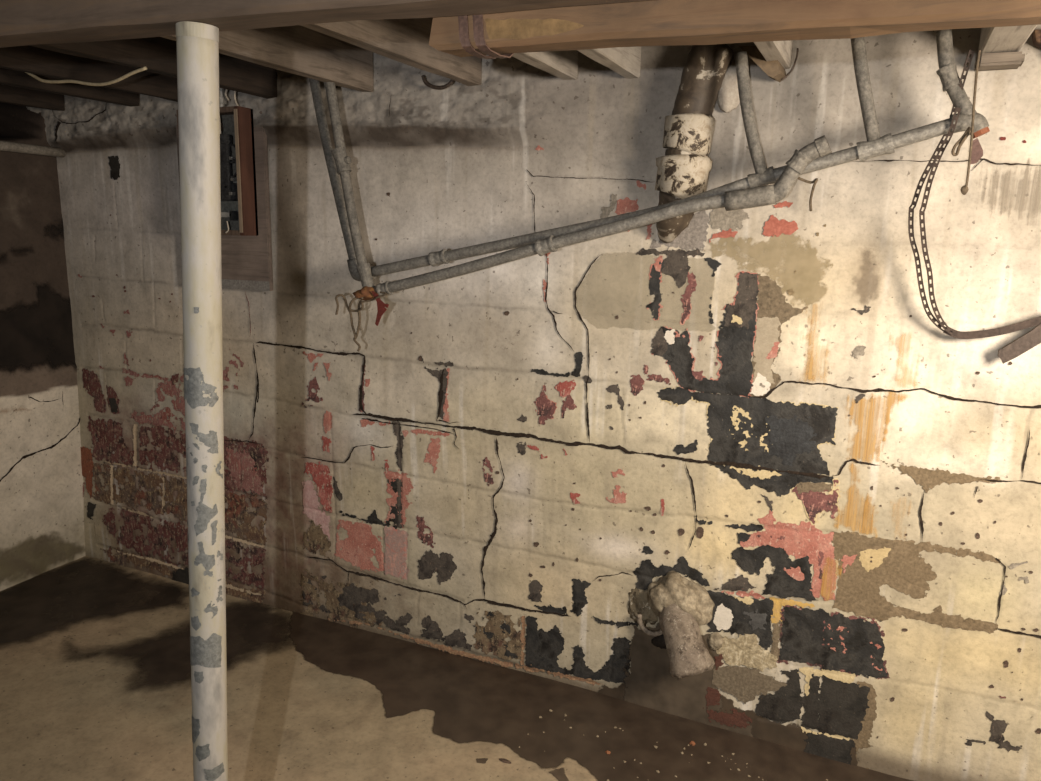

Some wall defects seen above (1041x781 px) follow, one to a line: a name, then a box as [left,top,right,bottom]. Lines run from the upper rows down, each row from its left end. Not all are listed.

water stain [0,284,77,372]
peeling [80,347,269,684]
peeling [299,351,638,686]
crack [225,254,875,616]
peeling [606,207,1033,765]
rust [835,487,877,537]
rust [848,336,915,473]
crack [755,381,1041,498]
water stain [0,535,189,646]
water stain [69,623,191,689]
water stain [226,602,914,781]
crack [995,558,1041,638]